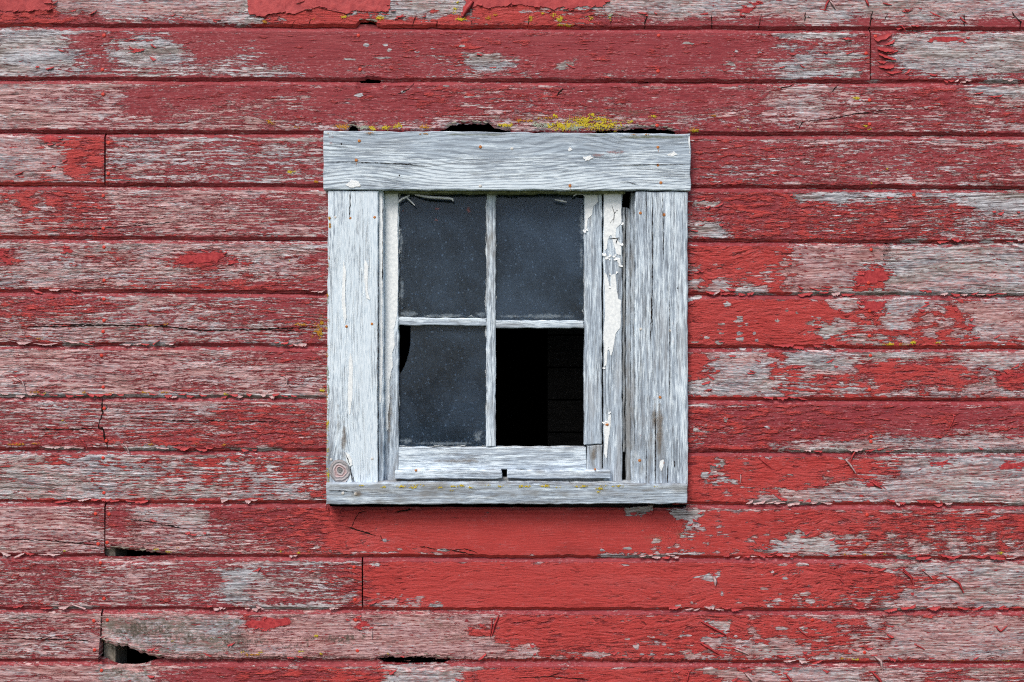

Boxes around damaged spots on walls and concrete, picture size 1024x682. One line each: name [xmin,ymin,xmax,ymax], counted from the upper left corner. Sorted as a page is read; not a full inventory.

peeling [0,0,869,71]
peeling [757,31,866,80]
peeling [874,0,1024,99]
peeling [789,191,847,204]
crack [17,323,326,331]
peeling [555,194,624,369]
peeling [688,265,767,394]
peeling [774,238,1024,380]
crack [43,397,294,449]
peeling [746,415,1024,507]
peeling [724,531,839,580]
peeling [624,554,1024,682]